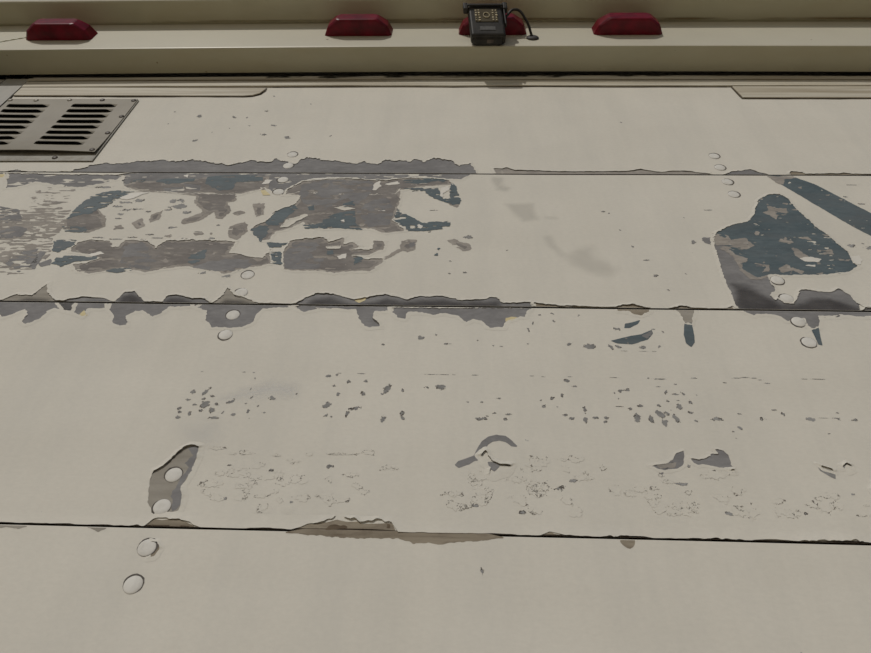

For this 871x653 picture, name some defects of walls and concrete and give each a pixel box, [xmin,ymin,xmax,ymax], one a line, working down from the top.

peeling [490,166,712,174]
peeling [0,156,664,352]
peeling [668,168,871,347]
peeling [175,387,266,419]
peeling [540,393,609,423]
peeling [614,378,698,427]
peeling [442,435,607,518]
peeling [609,446,739,517]
peeling [299,533,496,544]